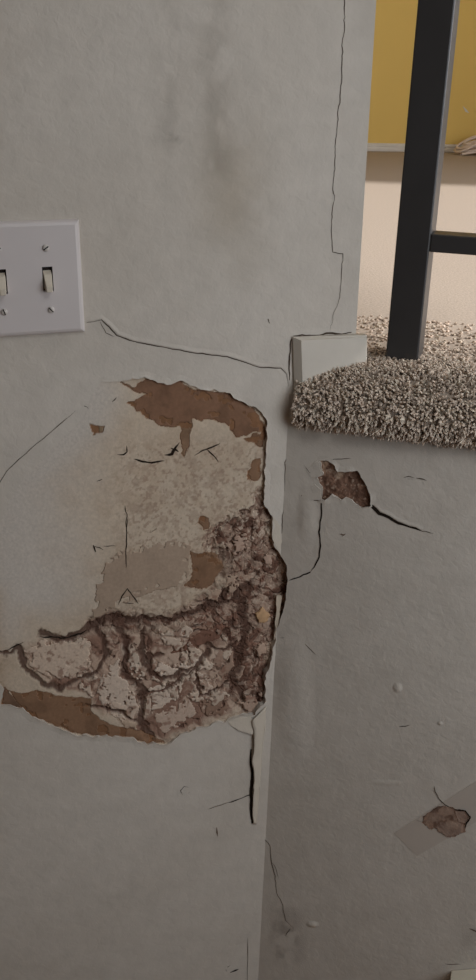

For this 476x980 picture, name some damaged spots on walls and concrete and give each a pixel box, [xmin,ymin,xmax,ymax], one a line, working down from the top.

crack [86,0,352,386]
peeling [0,371,433,824]
crack [265,840,294,934]
peeling [417,786,471,838]